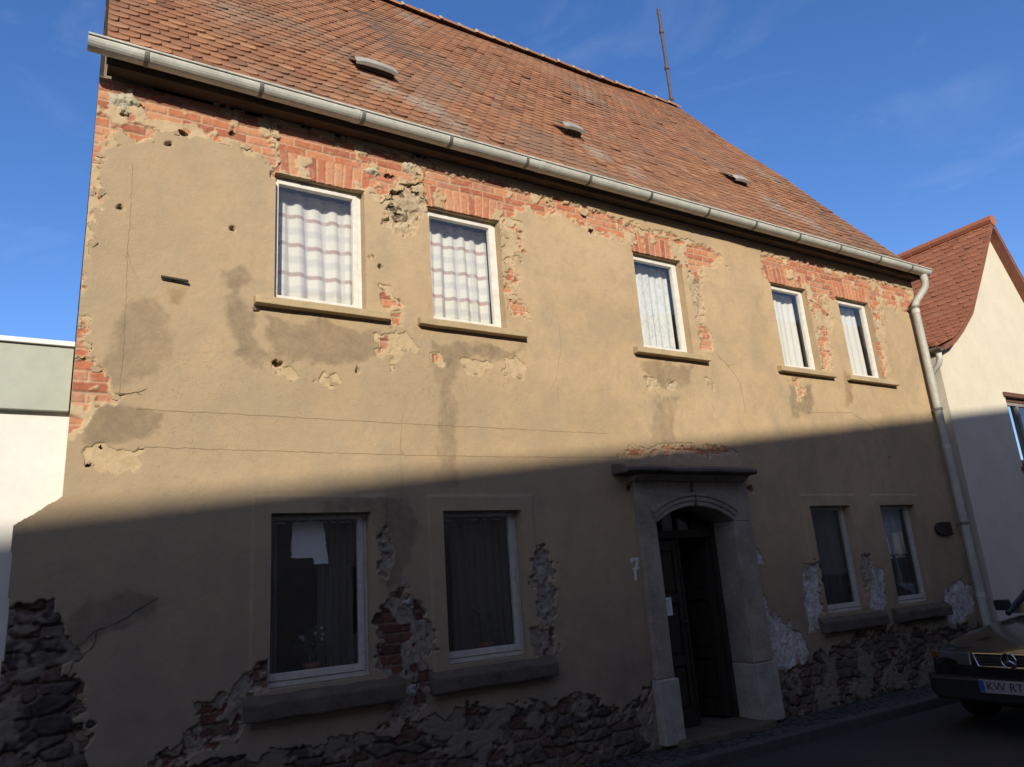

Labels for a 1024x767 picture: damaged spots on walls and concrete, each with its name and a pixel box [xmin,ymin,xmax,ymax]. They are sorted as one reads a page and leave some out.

spalling [84,77,728,352]
spalling [68,316,125,440]
crack [118,164,614,516]
flaking render [374,283,445,373]
spalling [760,251,912,376]
flaking render [83,443,145,474]
flaking render [0,600,96,767]
crack [62,597,159,682]
flaking render [148,587,655,767]
spalling [527,544,561,659]
flaking render [763,562,981,719]